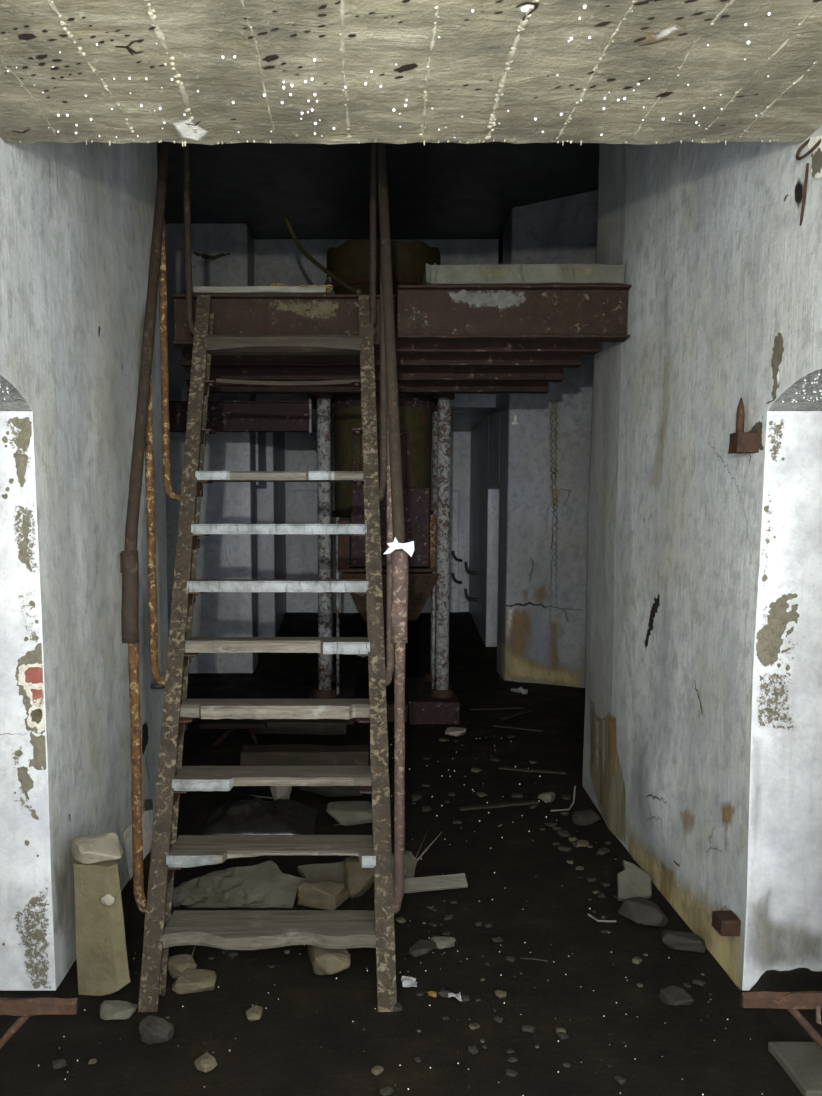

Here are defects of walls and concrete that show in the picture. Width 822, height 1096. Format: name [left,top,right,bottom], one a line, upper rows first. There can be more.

damp [47,0,135,141]
damp [143,0,207,147]
damp [438,0,539,143]
damp [556,0,638,145]
damp [680,1,822,146]
spalling [784,180,803,206]
spalling [807,135,822,179]
peeling [2,417,38,572]
crack [506,400,582,625]
spalling [5,587,46,820]
peeling [755,593,800,731]
peeling [14,888,51,989]